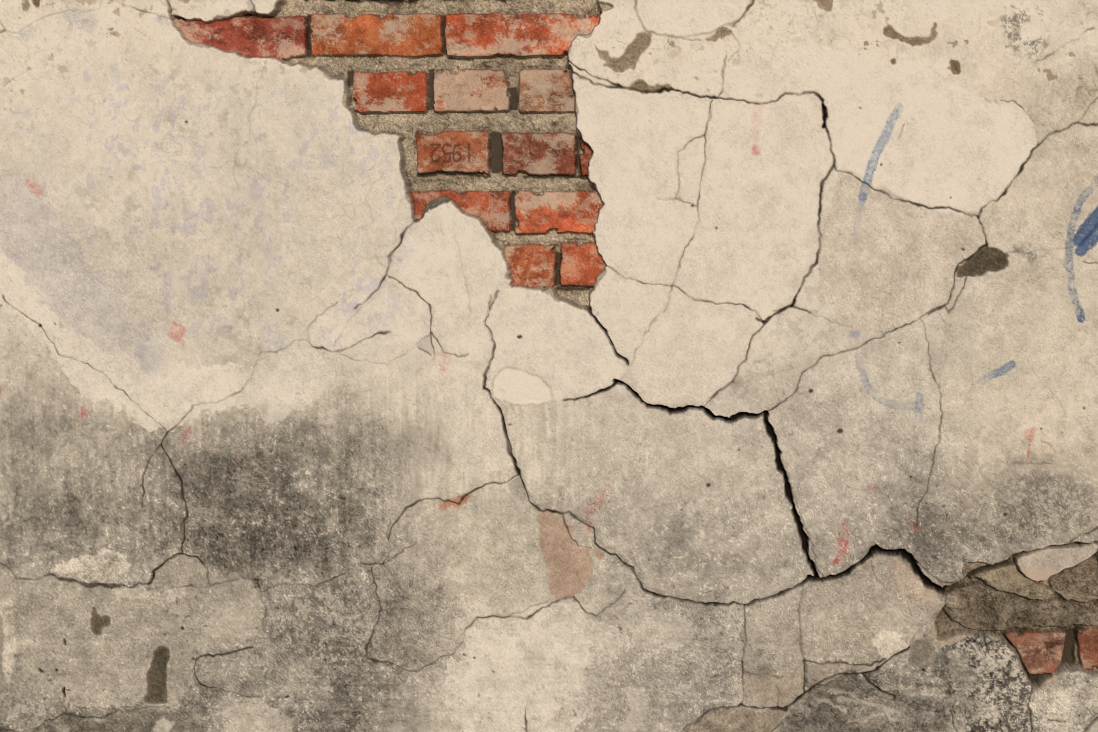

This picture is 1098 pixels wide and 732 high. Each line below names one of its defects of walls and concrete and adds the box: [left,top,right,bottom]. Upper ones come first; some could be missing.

crack [0,0,174,35]
spalling [596,32,673,94]
crack [634,0,702,42]
spalling [883,24,938,47]
spalling [174,0,613,311]
spalling [956,246,1009,278]
crack [0,219,469,527]
crack [149,56,1098,732]
leakage [0,374,447,593]
crack [0,533,205,589]
spalling [908,542,1098,689]
leakage [321,662,435,732]